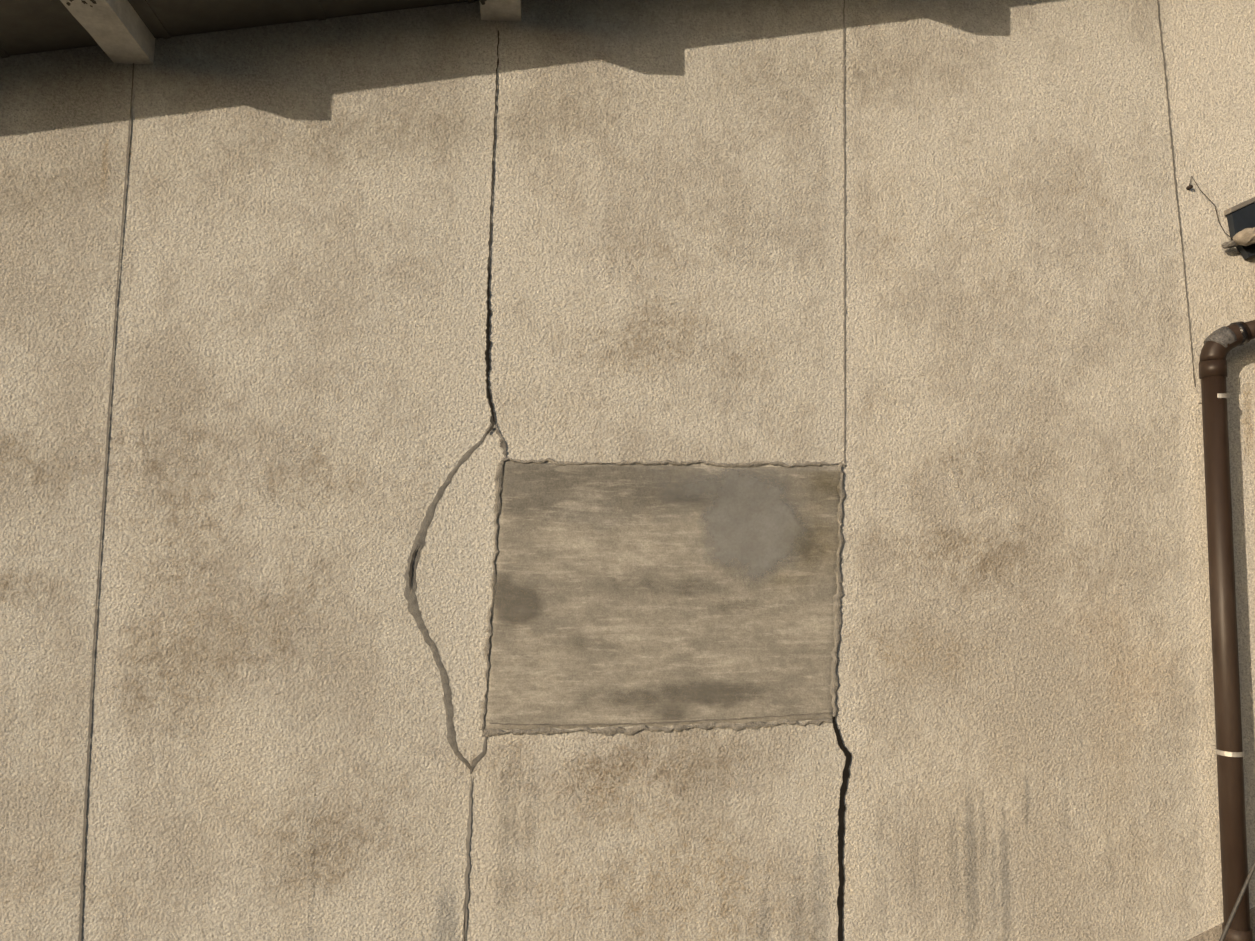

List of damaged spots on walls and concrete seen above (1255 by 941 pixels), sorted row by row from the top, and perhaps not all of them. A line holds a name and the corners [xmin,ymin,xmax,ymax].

crack [404,30,509,941]
crack [832,715,851,941]